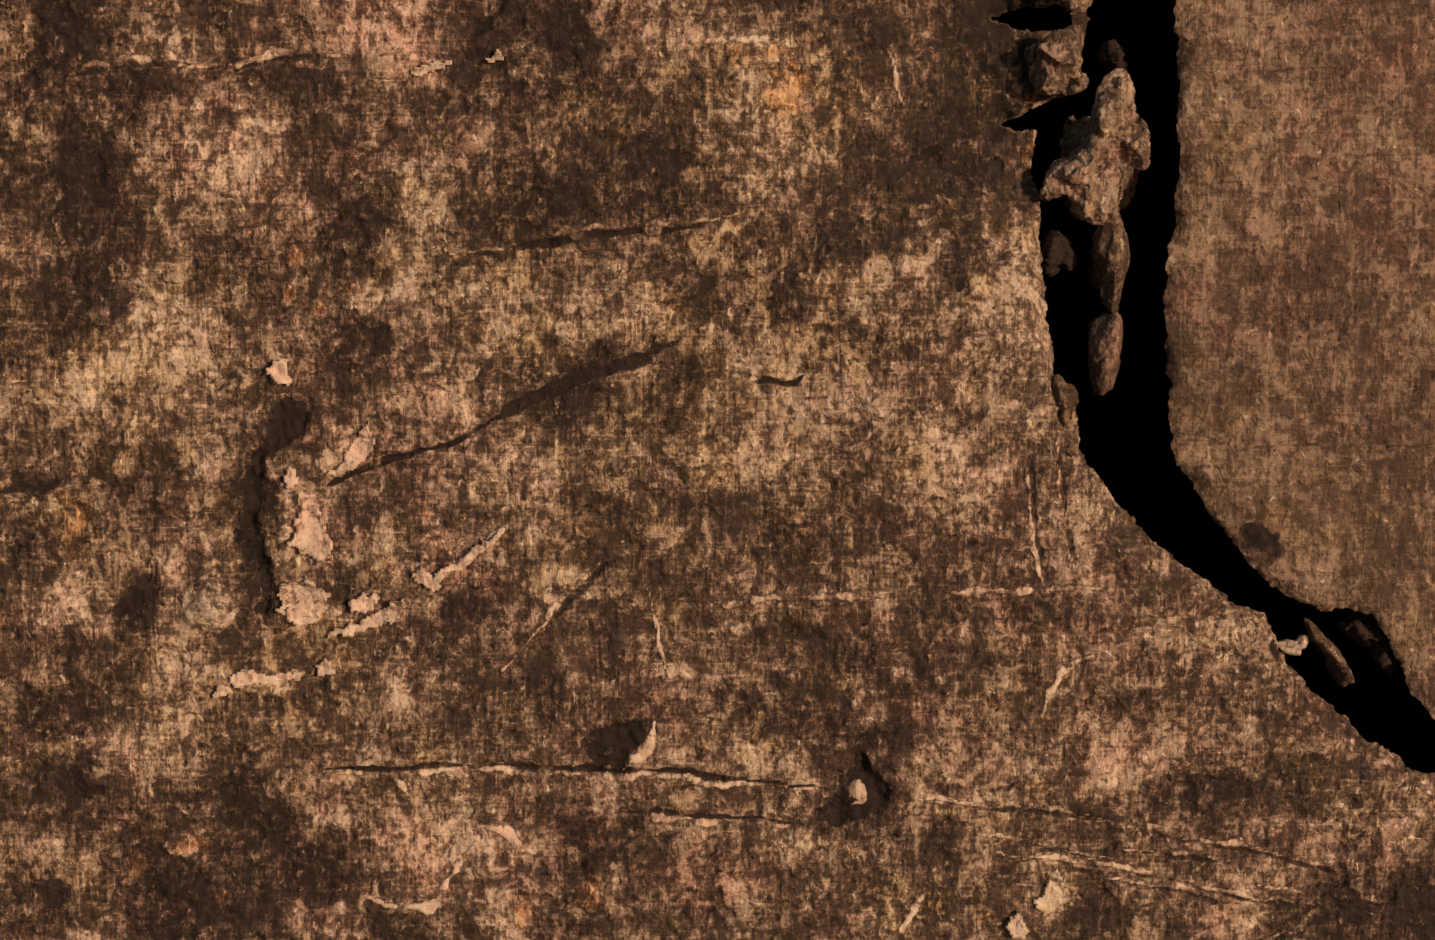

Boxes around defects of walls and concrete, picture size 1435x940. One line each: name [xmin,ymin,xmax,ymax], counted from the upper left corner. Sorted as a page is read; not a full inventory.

crack [908,138,946,163]
crack [975,0,1435,774]
crack [919,795,1395,914]